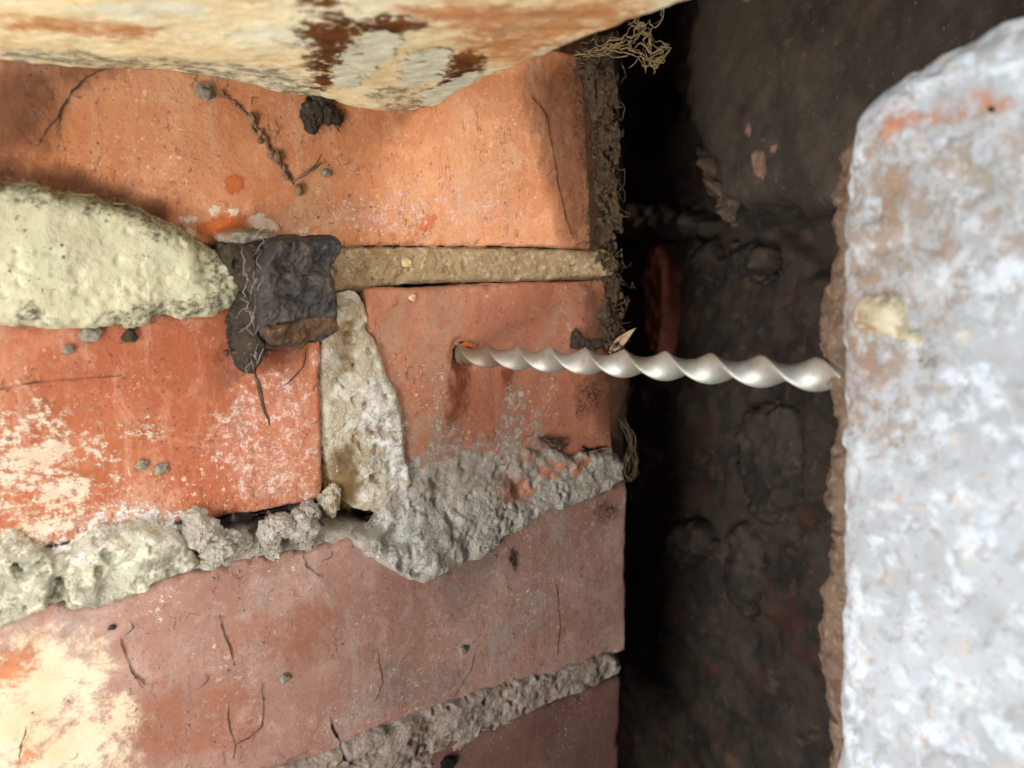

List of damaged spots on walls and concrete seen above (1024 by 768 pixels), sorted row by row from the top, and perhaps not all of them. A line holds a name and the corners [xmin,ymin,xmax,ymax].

corrosion [288,0,616,92]
crack [39,68,106,143]
crack [348,94,590,251]
corrosion [224,243,339,374]
leakage [0,397,184,565]
leakage [207,369,316,507]
crack [121,641,146,688]
crack [219,617,234,665]
crack [227,688,264,758]